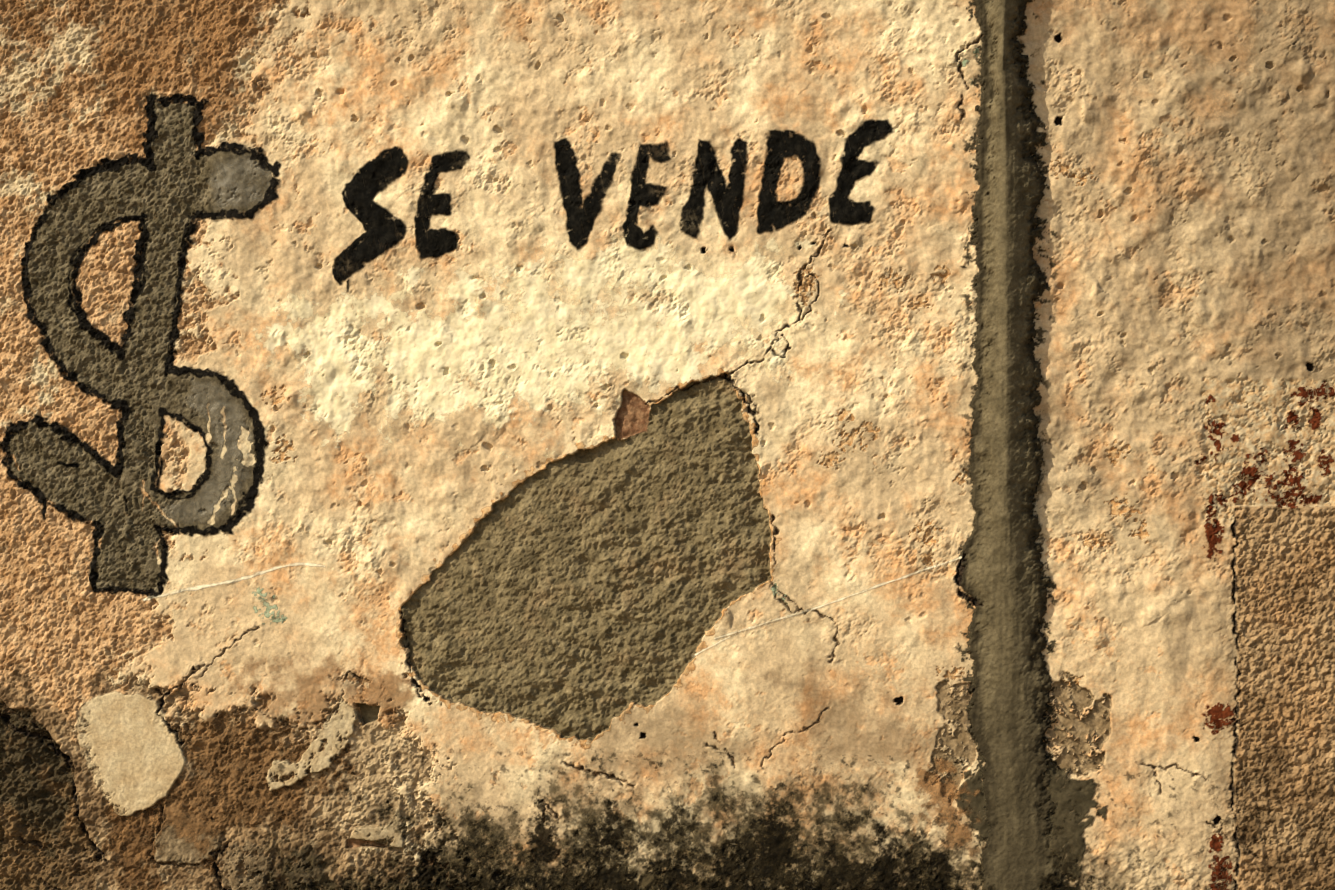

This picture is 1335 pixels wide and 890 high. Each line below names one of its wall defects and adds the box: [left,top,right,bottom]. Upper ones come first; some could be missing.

crack [647,230,830,435]
spalling [396,368,781,749]
peeling [266,698,380,791]
peeling [1046,672,1111,776]
peeling [154,825,222,865]
peeling [347,802,404,848]
leakage [102,708,992,890]
leakage [1041,849,1109,890]